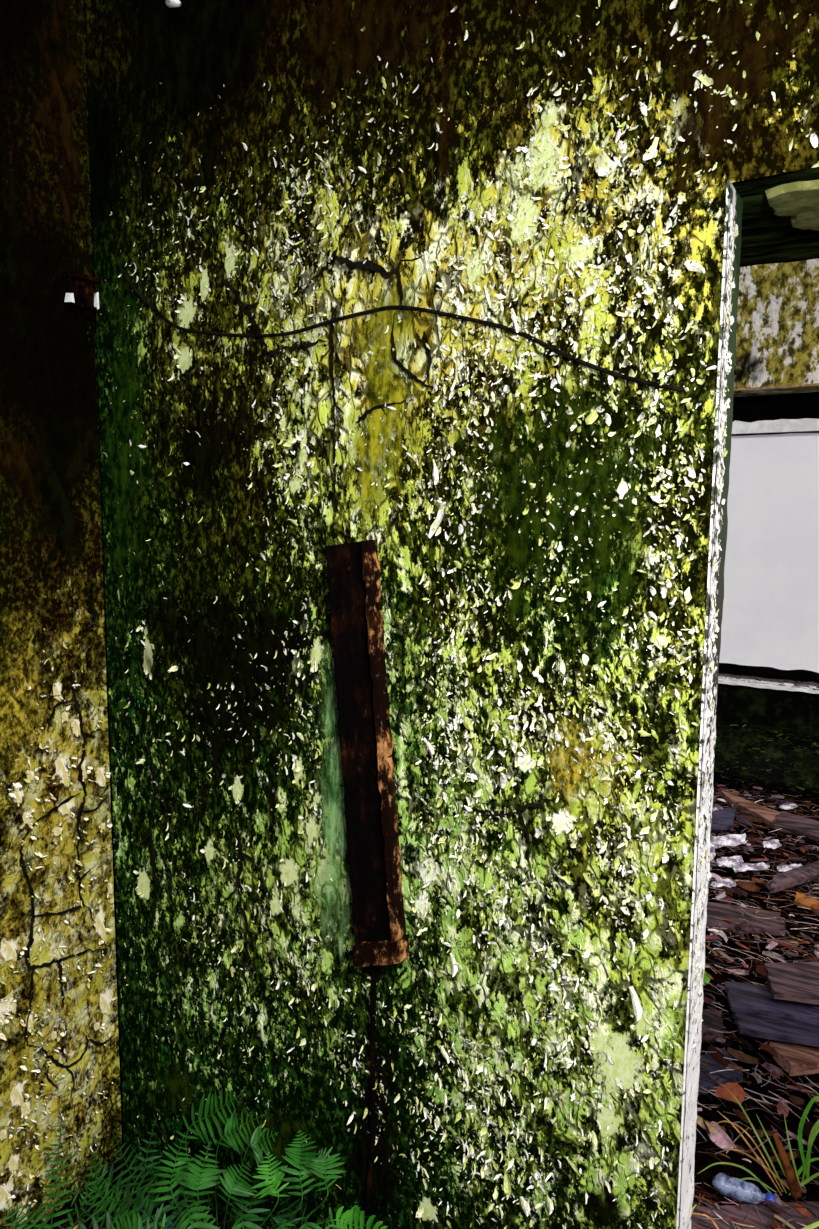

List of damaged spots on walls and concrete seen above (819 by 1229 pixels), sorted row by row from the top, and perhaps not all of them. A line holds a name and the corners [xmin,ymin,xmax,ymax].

crack [0,646,114,1098]